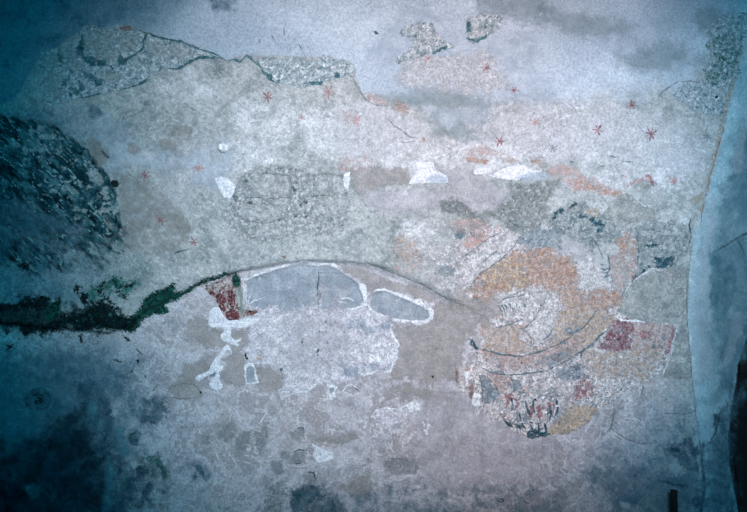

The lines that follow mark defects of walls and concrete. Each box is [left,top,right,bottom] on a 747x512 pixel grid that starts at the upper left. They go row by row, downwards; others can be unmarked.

flaking render [38,24,222,107]
flaking render [258,55,356,88]
flaking render [396,21,455,64]
flaking render [466,12,505,44]
flaking render [673,9,747,117]
peeling [409,161,448,184]
peeling [474,164,547,195]
crack [365,261,463,305]